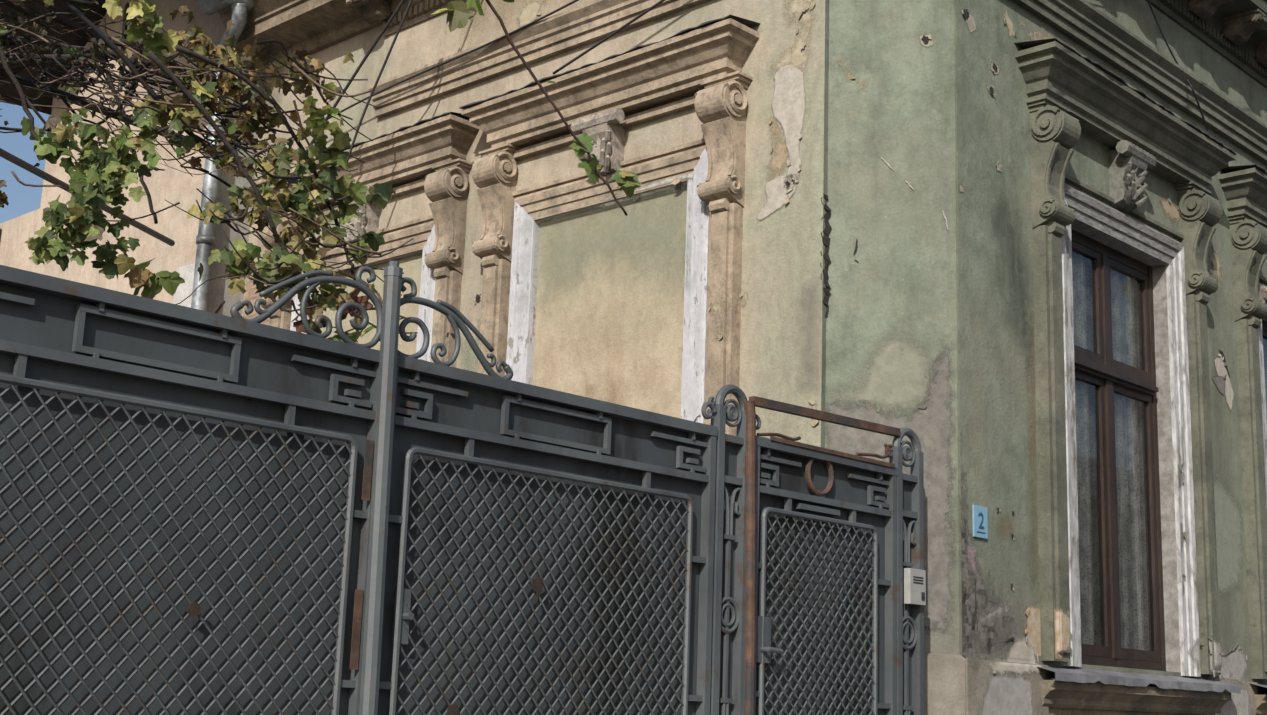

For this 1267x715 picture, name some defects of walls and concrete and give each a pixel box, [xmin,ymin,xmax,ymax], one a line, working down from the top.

flaking render [757,0,815,221]
crack [820,193,859,317]
flaking render [1214,354,1234,409]
flaking render [808,348,1072,675]